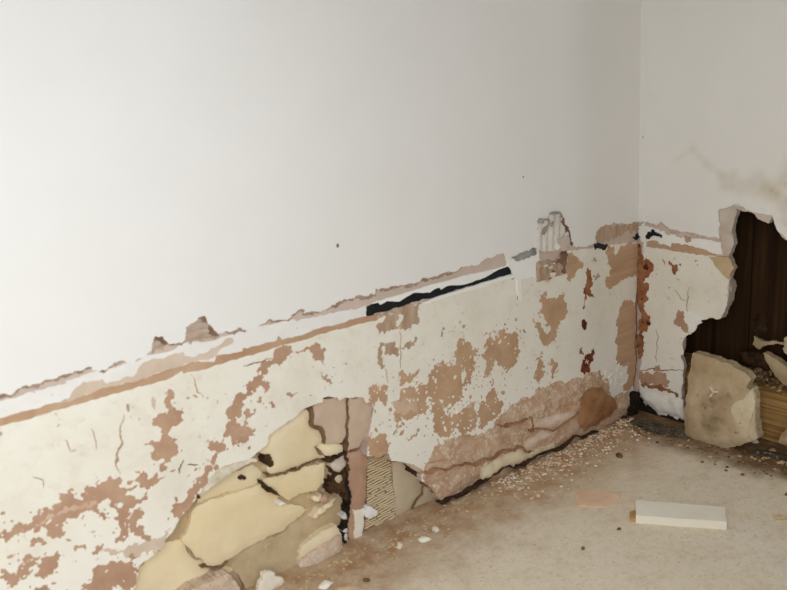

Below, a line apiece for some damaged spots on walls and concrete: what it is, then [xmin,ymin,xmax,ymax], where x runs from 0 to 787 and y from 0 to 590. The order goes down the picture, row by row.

spalling [566,204,773,318]
peeling [532,291,568,346]
peeling [674,310,704,333]
spalling [748,389,764,441]
spalling [0,300,684,590]